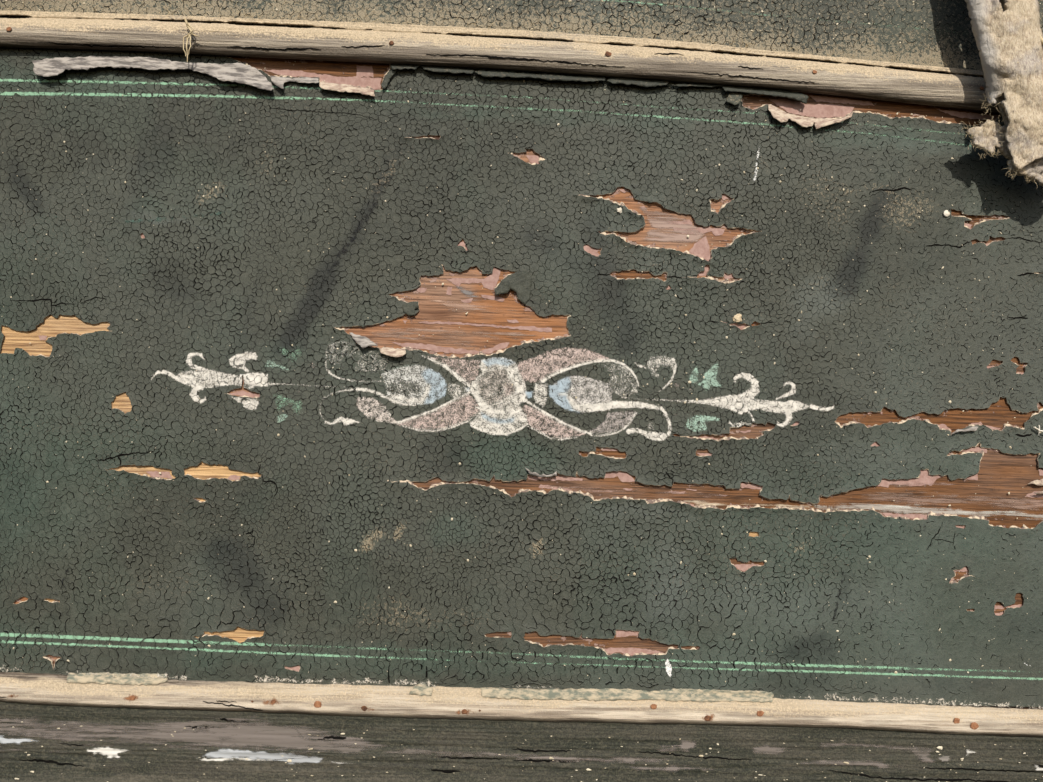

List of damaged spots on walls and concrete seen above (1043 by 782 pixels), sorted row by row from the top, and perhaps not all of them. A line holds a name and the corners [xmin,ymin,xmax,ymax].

crack [0,0,979,57]
crack [127,51,233,64]
peeling [32,56,1000,129]
crack [426,54,625,67]
crack [683,66,817,84]
crack [867,181,921,198]
peeling [579,186,761,283]
peeling [335,264,571,358]
peeling [0,314,110,357]
peeling [105,461,262,481]
peeling [387,397,1043,529]
crack [970,418,1043,464]